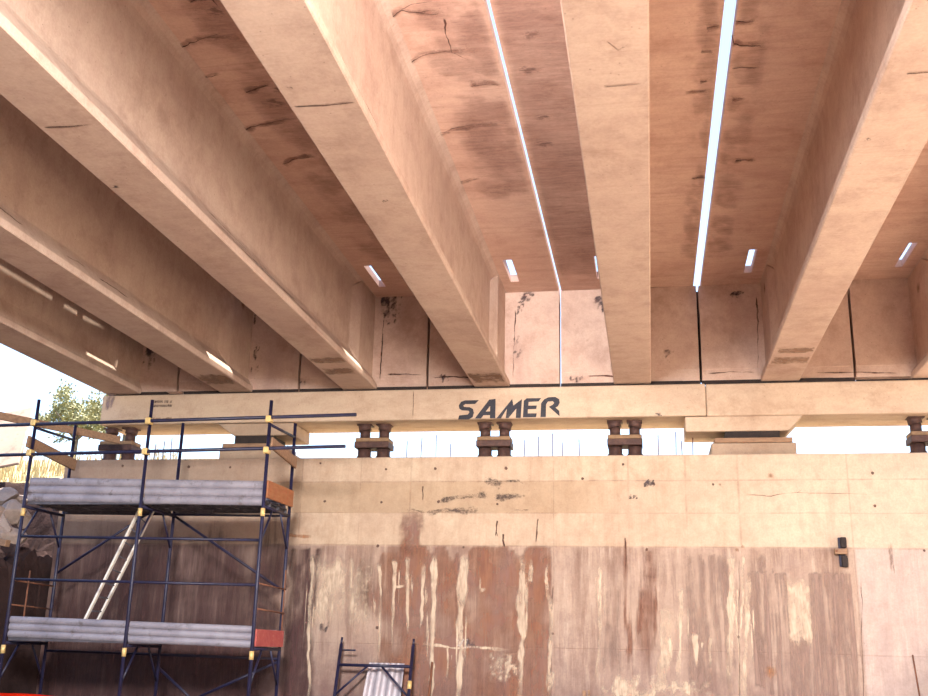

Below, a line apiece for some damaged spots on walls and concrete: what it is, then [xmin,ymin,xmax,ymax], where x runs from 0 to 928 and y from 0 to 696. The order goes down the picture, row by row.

crack [393,3,463,62]
crack [380,321,417,407]
leakage [37,515,554,696]
rust [624,597,657,654]
leakage [602,556,858,696]